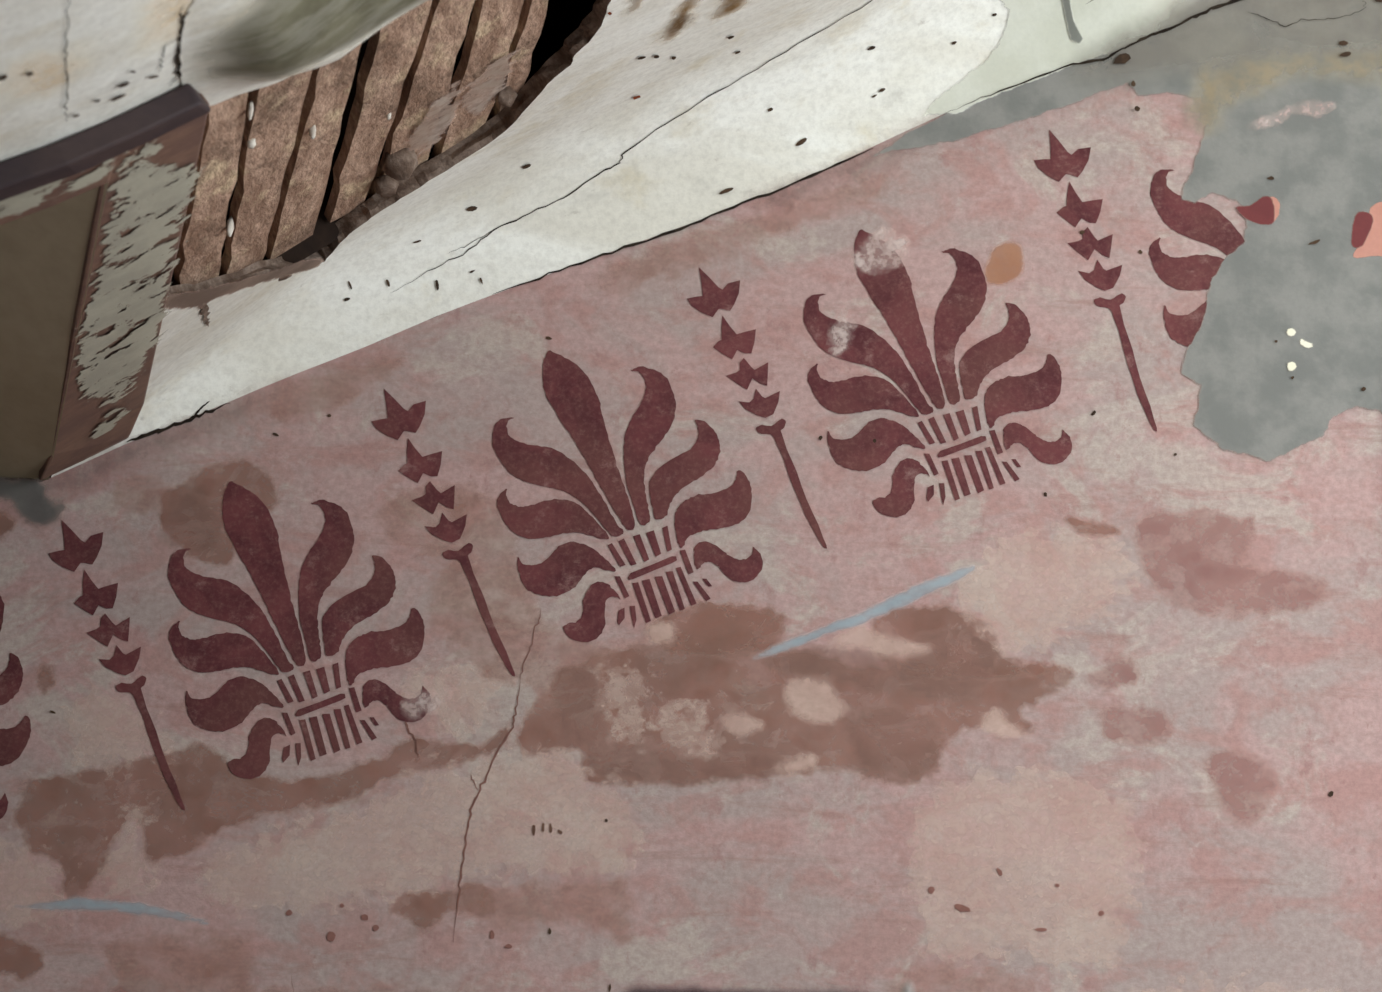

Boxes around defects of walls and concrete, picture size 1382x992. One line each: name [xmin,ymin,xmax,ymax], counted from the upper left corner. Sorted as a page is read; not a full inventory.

peeling [0,0,611,439]
crack [399,0,873,294]
damp [663,0,697,40]
damp [715,0,745,17]
flaking render [874,0,1235,156]
flaking render [1181,39,1382,461]
damp [1138,514,1323,614]
crack [453,611,541,941]
damp [16,602,1072,896]